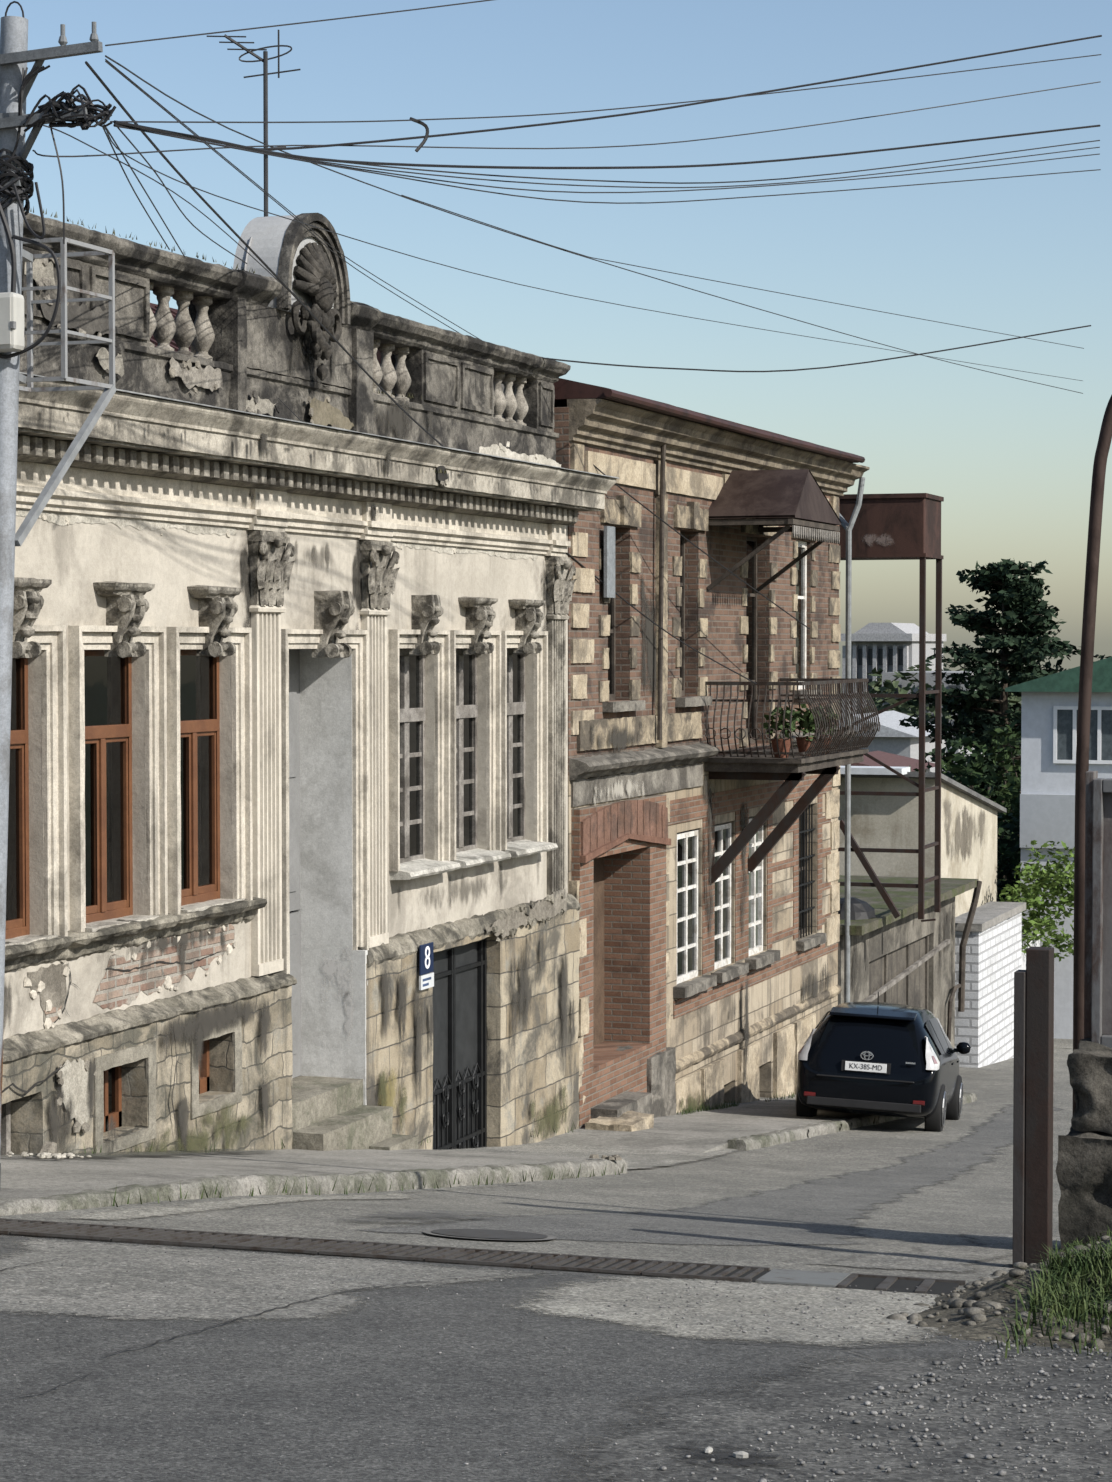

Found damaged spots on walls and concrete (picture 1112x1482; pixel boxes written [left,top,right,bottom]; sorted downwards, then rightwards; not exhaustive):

flaking render [24,253,125,380]
peeling [169,357,223,393]
flaking render [479,441,561,467]
corrosion [864,534,892,546]
damp [944,802,985,858]
damp [3,985,12,1030]
flaking render [24,960,70,1029]
flaking render [93,924,237,1009]
damp [512,936,545,1035]
damp [561,953,575,1057]
peeling [55,1058,97,1133]